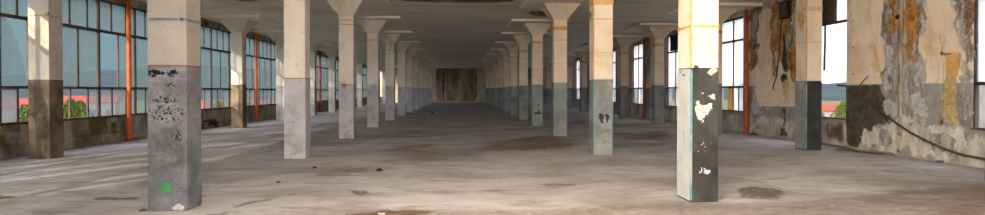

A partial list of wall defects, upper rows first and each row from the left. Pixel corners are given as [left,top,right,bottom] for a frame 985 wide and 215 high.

peeling [694,93,715,123]
peeling [749,0,796,116]
peeling [868,0,937,126]
peeling [950,0,978,121]